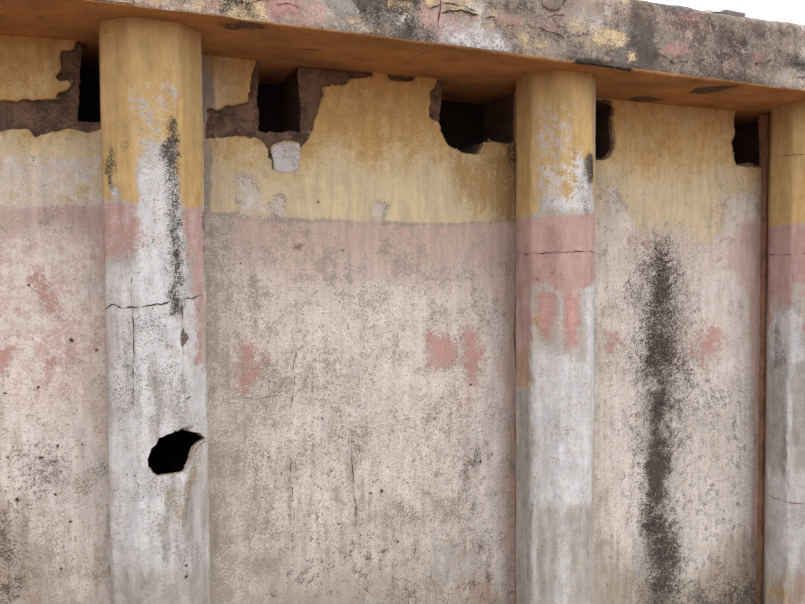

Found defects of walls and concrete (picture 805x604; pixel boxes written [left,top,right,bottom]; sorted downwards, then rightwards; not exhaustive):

spalling [0,44,101,135]
spalling [205,63,369,176]
spalling [429,82,460,151]
water stain [159,116,186,319]
crack [106,278,201,385]
spalling [148,424,206,476]
water stain [621,232,757,604]